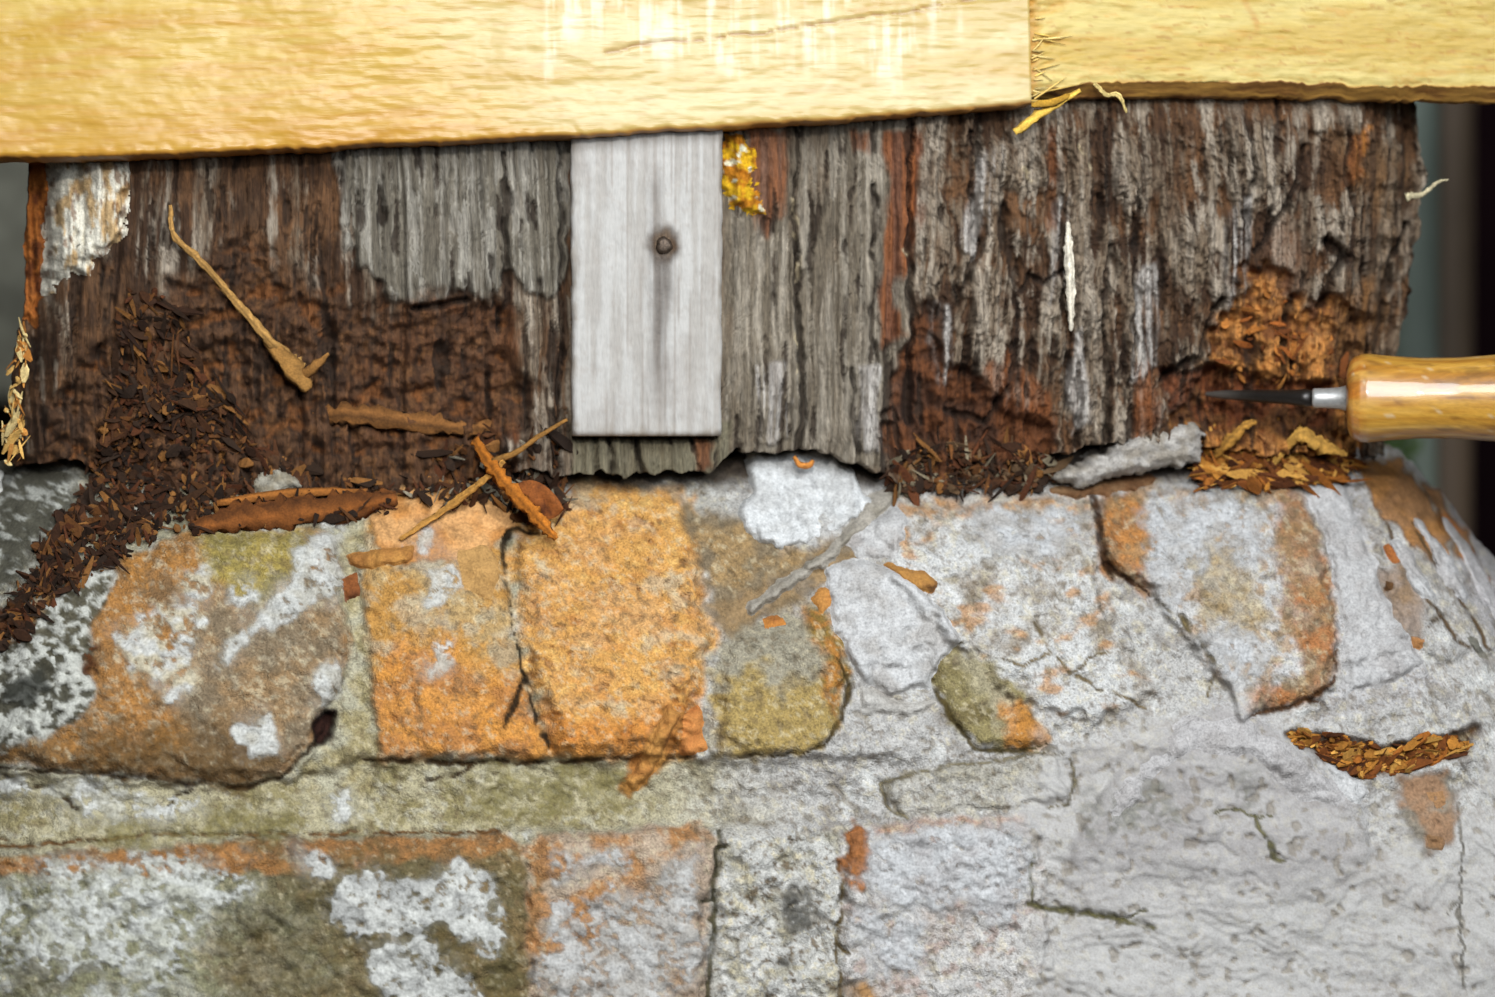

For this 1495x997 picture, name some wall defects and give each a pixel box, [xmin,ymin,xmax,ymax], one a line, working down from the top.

crack [1379,511,1491,650]
crack [363,527,630,781]
crack [666,753,696,761]
crack [735,657,852,759]
crack [1215,807,1285,863]